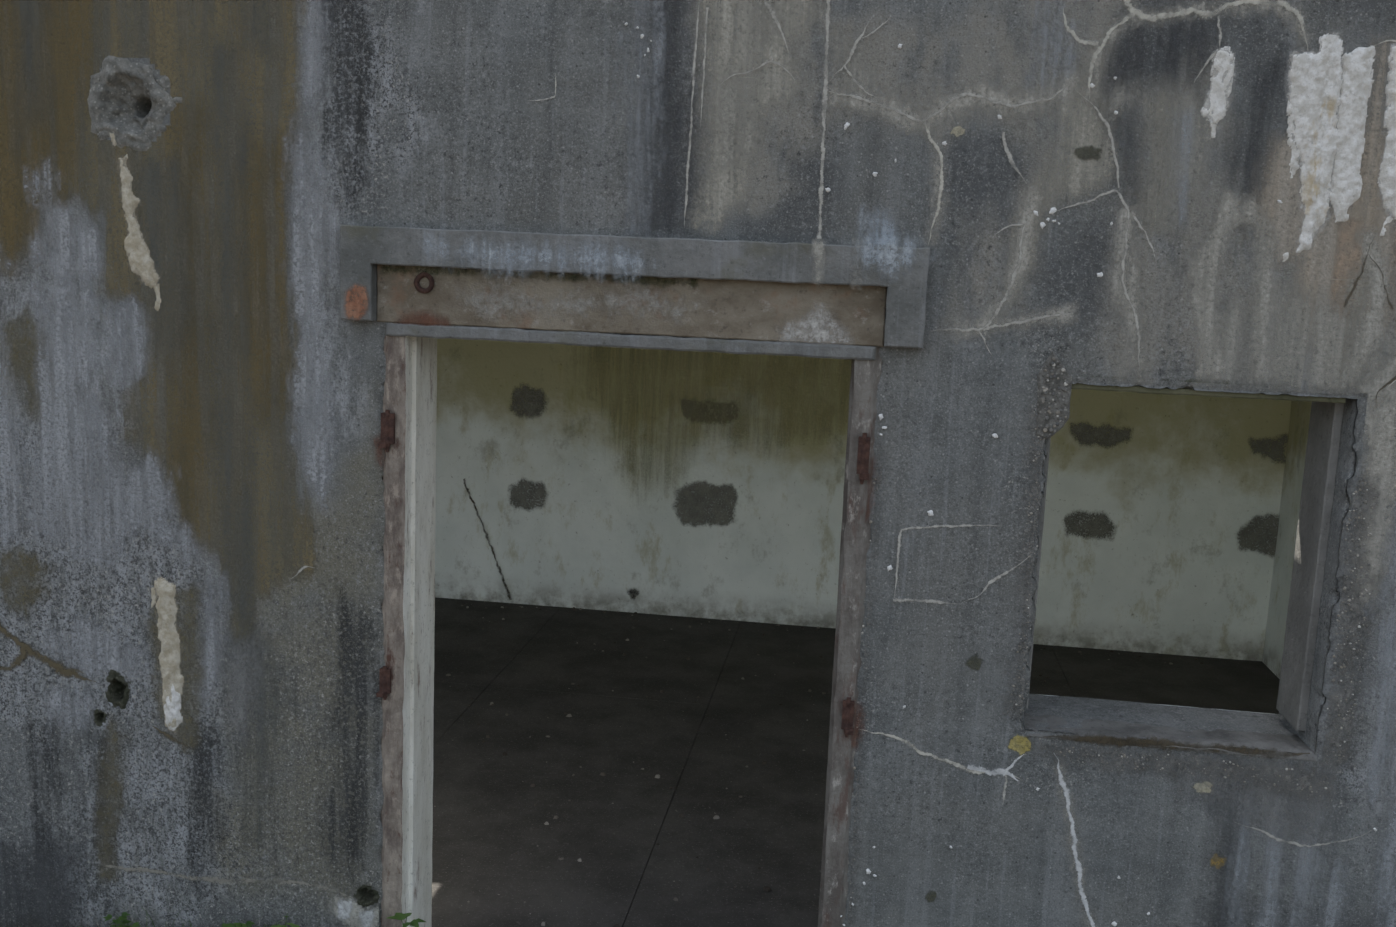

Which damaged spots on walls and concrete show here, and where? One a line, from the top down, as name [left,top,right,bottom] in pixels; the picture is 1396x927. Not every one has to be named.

crack [717,0,795,87]
spalling [87,55,182,151]
crack [829,0,1308,362]
damp [0,0,373,644]
rust [345,285,368,319]
damp [829,0,1396,613]
crack [1344,236,1394,309]
crack [1376,377,1396,405]
crack [0,624,96,682]
crack [860,729,1310,927]